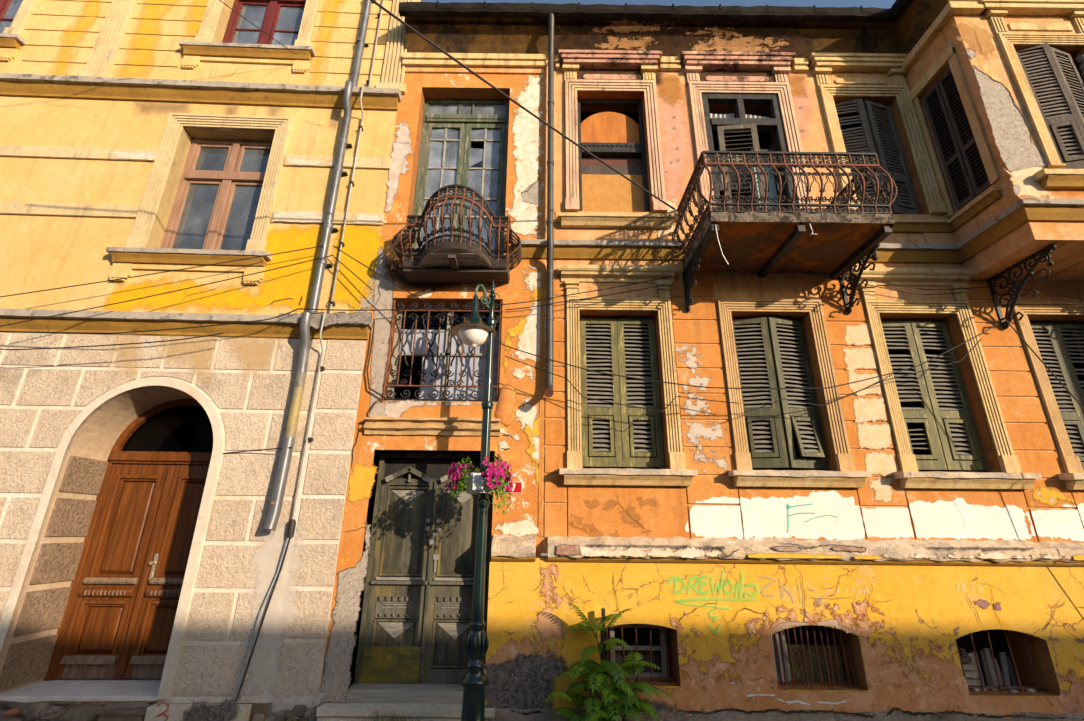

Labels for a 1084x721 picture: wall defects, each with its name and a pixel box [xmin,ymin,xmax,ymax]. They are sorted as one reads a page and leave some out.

peeling [686,26,792,52]
peeling [505,74,546,239]
flaking render [957,23,1055,199]
peeling [500,266,547,379]
peeling [675,345,731,474]
peeling [843,322,899,503]
peeling [348,462,377,502]
flaking render [320,521,372,704]
peeling [484,497,726,676]
crack [679,602,772,636]
peeling [587,598,1084,721]
crack [802,575,895,622]